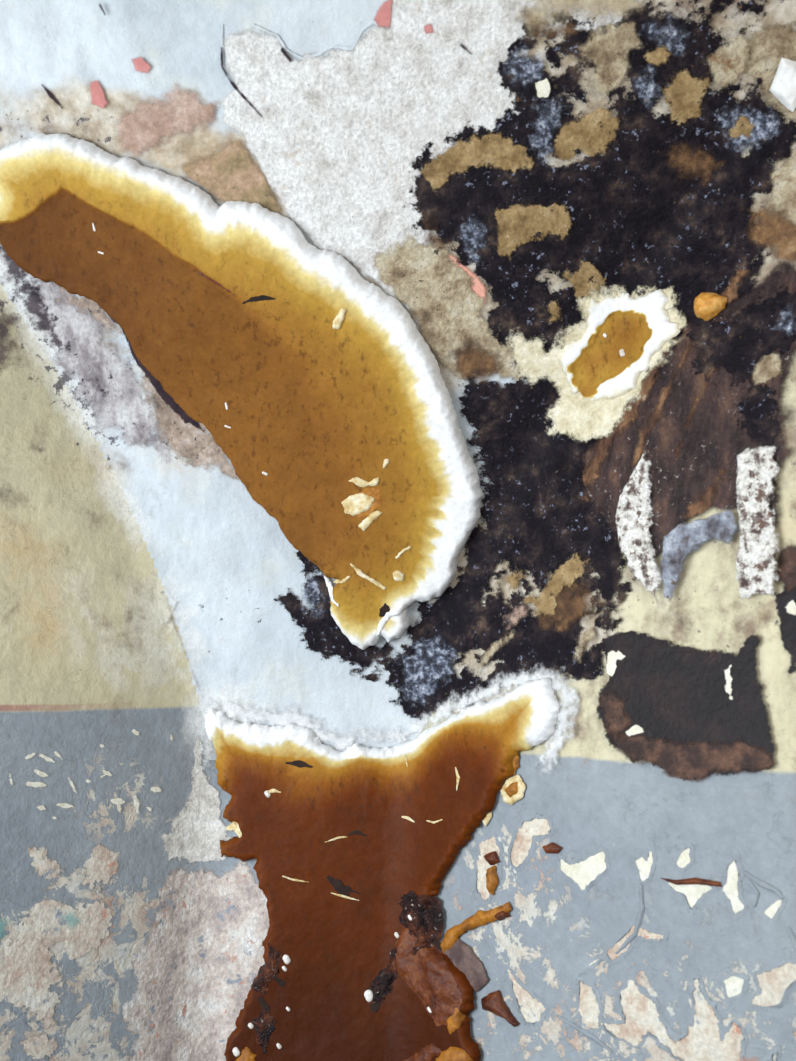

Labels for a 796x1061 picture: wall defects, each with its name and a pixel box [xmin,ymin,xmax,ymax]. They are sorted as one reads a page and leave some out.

flaking render [119,0,671,381]
damp [0,247,169,461]
damp [274,0,796,776]
peeling [616,446,780,600]
peeling [0,844,120,1060]
flaking render [122,733,269,1061]
peeling [439,938,489,992]
peeling [474,813,554,905]
peeling [503,964,549,1027]
peeling [555,847,610,893]
peeling [576,958,796,1061]
peeling [632,829,787,923]